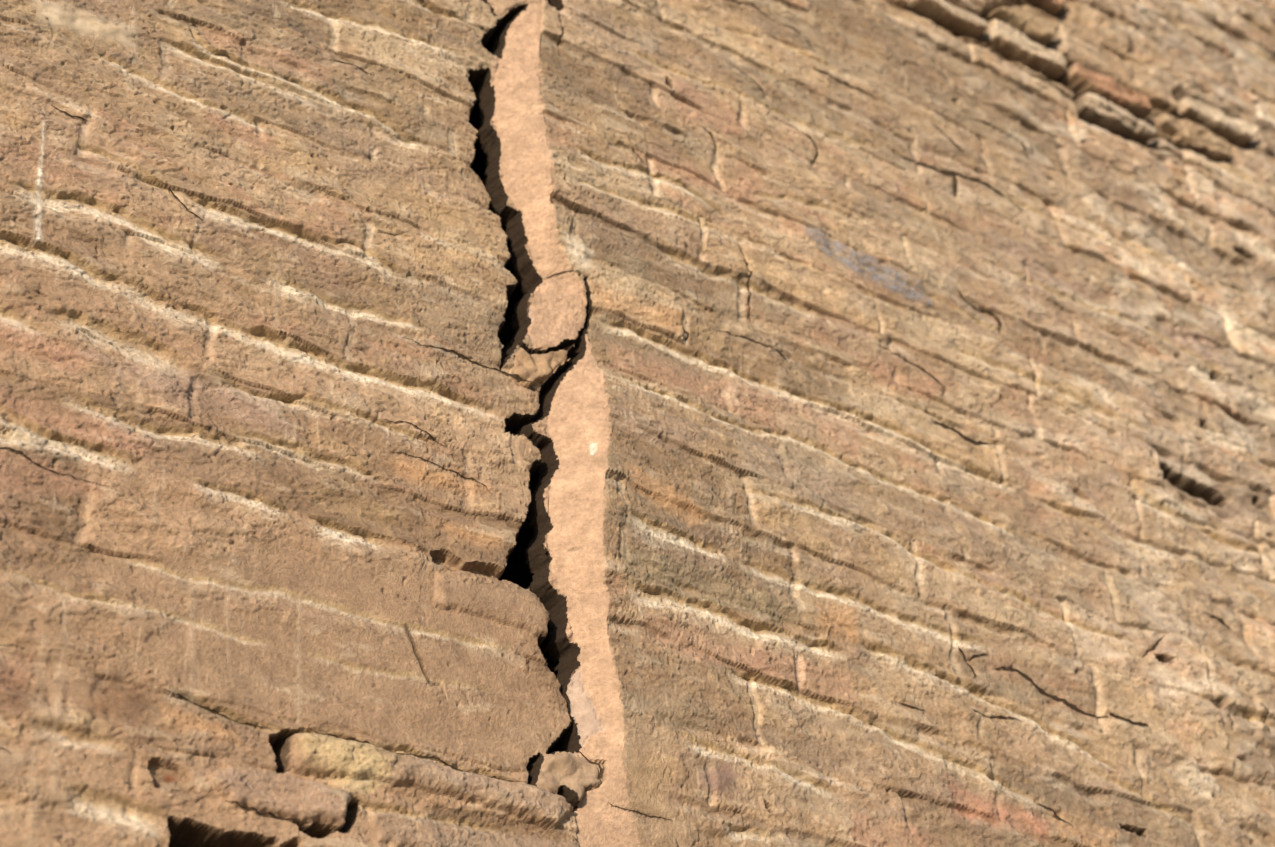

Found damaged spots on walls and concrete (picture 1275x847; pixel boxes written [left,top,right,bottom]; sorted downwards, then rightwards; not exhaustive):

spalling [873,0,1261,165]
crack [304,0,679,847]
crack [958,647,1148,726]
crack [163,688,274,731]
spalling [147,756,201,793]
crack [226,800,300,821]
spalling [279,836,303,847]